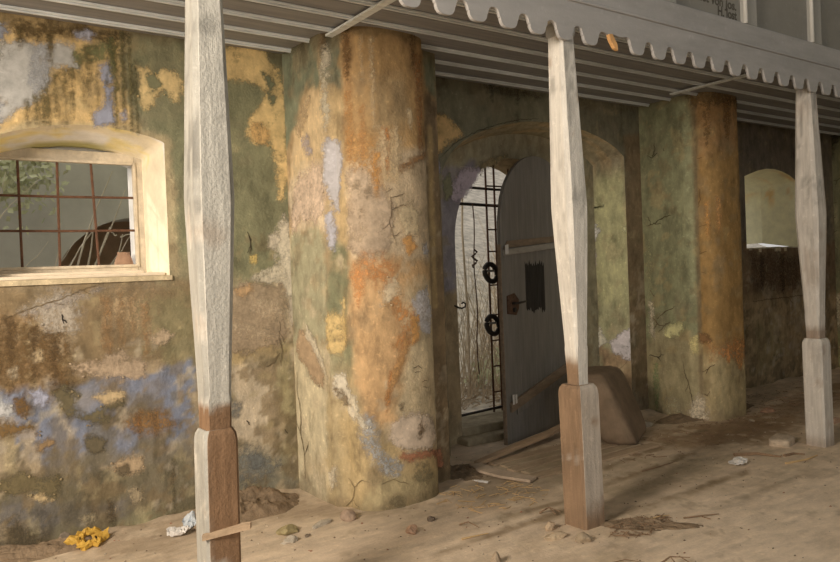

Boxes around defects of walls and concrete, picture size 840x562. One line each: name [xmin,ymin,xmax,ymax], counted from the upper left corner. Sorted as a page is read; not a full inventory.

peeling [0,22,93,123]
leakage [11,19,139,133]
spalling [93,62,127,128]
peeling [225,46,419,259]
leakage [0,316,77,393]
peeling [0,348,147,454]
peeling [151,329,174,345]
spalling [296,297,444,476]
corrosion [386,297,420,406]
peeling [412,288,432,334]
peeling [598,327,631,361]